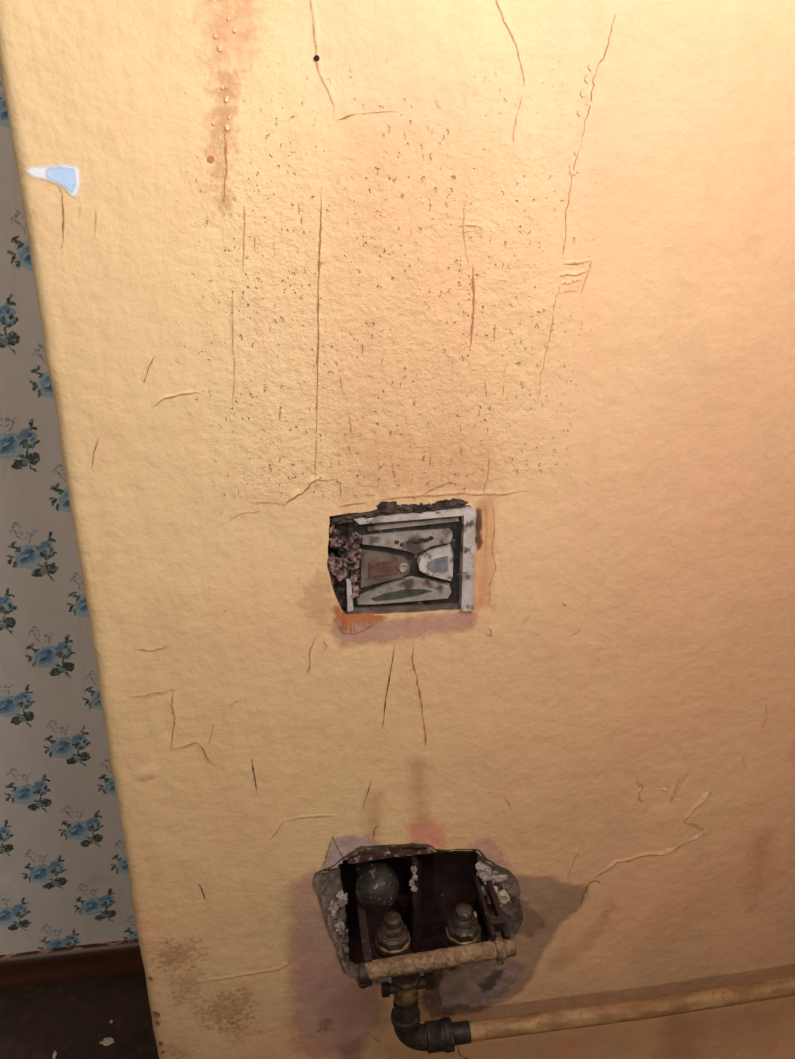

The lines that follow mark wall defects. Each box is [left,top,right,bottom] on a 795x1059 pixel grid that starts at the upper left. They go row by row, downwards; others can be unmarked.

crack [310,0,398,120]
crack [535,12,616,399]
crack [229,186,532,637]
spalling [327,523,362,599]
rust [334,608,384,634]
crack [128,688,216,766]
crack [382,644,426,746]
crack [580,765,712,906]
peeling [294,836,523,1059]